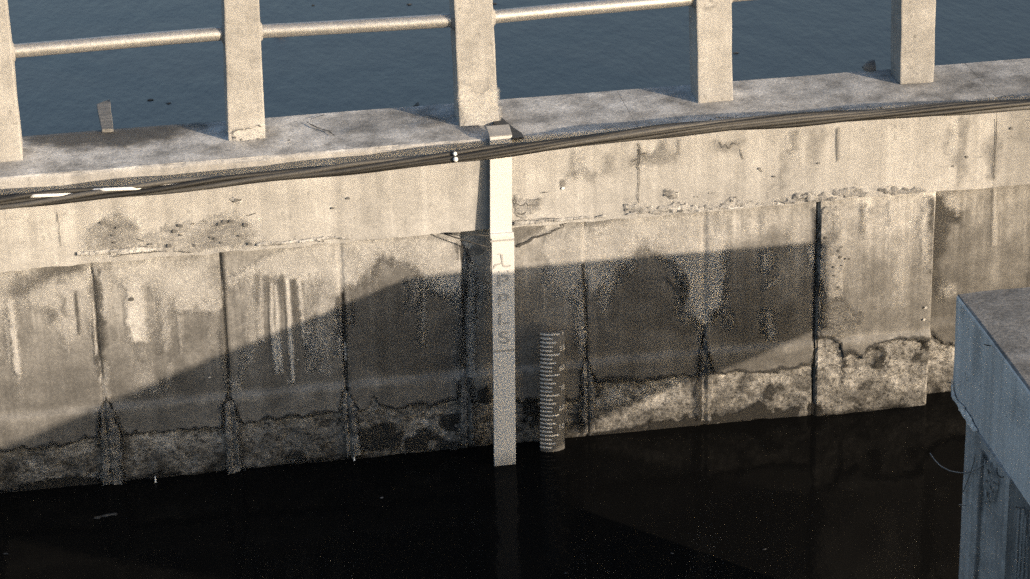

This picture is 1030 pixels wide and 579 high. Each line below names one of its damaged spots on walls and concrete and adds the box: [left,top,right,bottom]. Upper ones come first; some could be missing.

leakage [30,253,230,390]
leakage [245,236,476,385]
leakage [542,212,722,347]
spalling [565,186,977,438]
spalling [0,423,104,492]
spalling [101,384,494,480]
spalling [515,398,540,443]